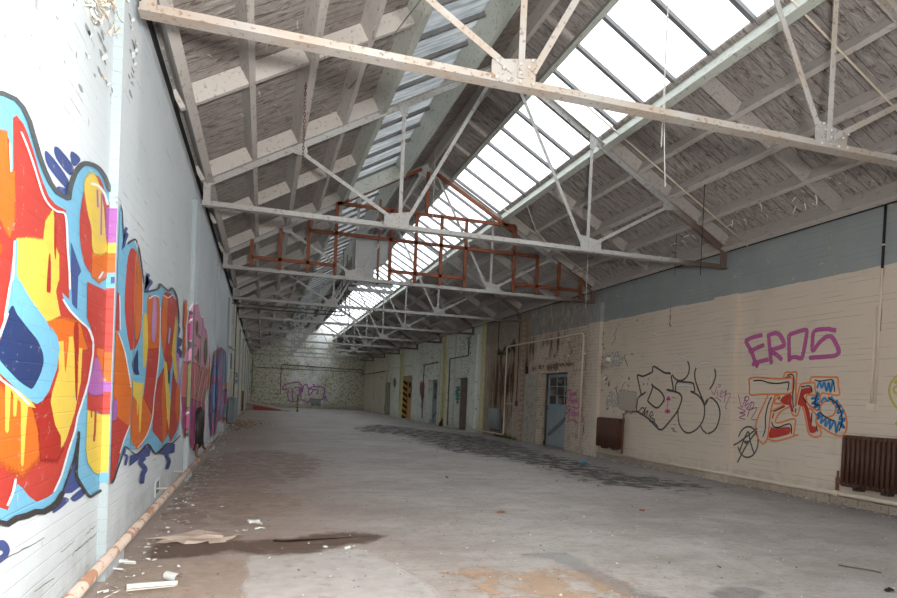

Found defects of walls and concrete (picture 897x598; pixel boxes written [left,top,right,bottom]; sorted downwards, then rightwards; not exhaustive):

peeling [73,0,138,99]
leakage [147,532,382,559]